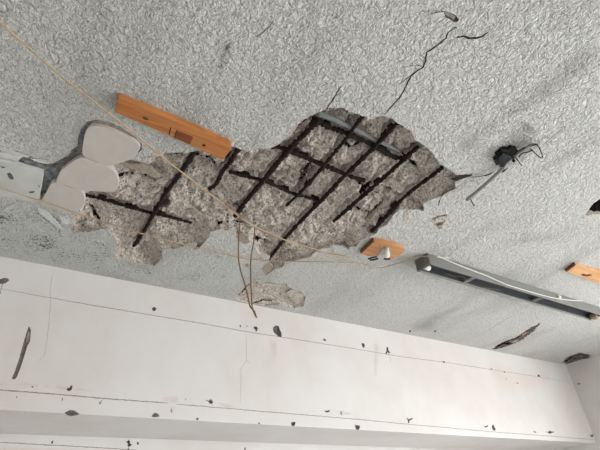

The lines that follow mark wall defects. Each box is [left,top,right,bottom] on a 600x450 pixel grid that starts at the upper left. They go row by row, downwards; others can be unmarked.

crack [384,27,488,115]
spalling [0,108,472,308]
crack [0,274,560,381]
spalling [561,352,592,364]